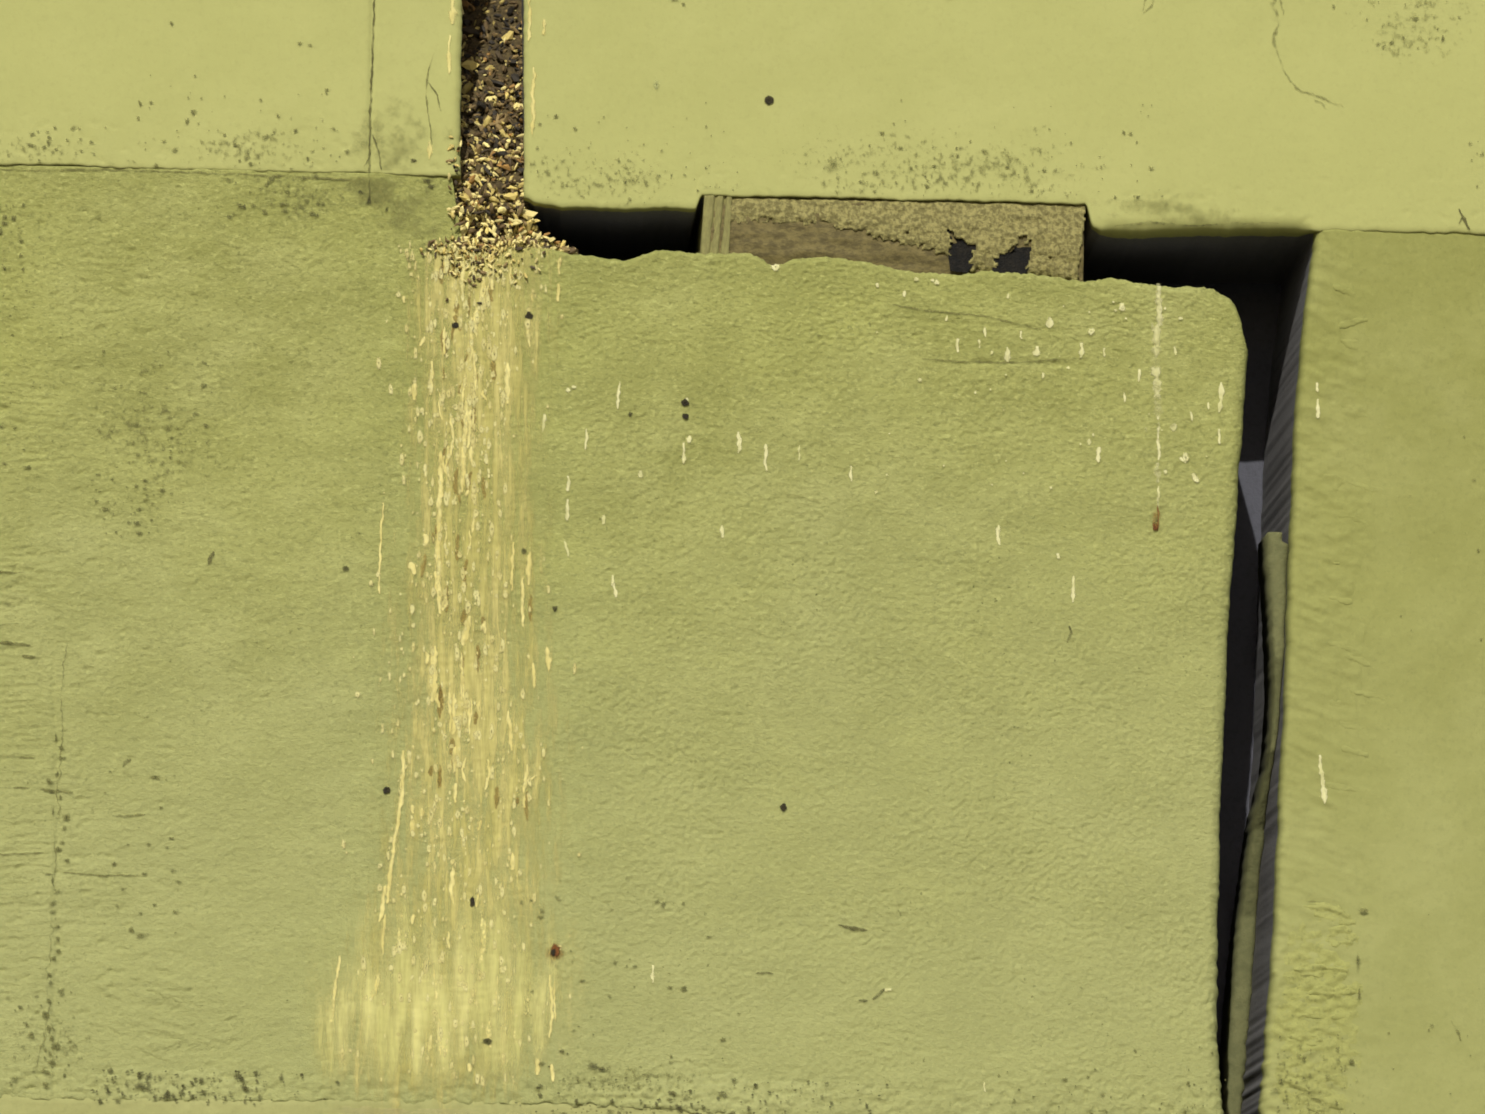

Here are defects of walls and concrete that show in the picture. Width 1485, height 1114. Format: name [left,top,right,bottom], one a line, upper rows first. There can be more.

spalling [947,230,976,273]
spalling [992,246,1031,274]
spalling [14,903,303,1105]